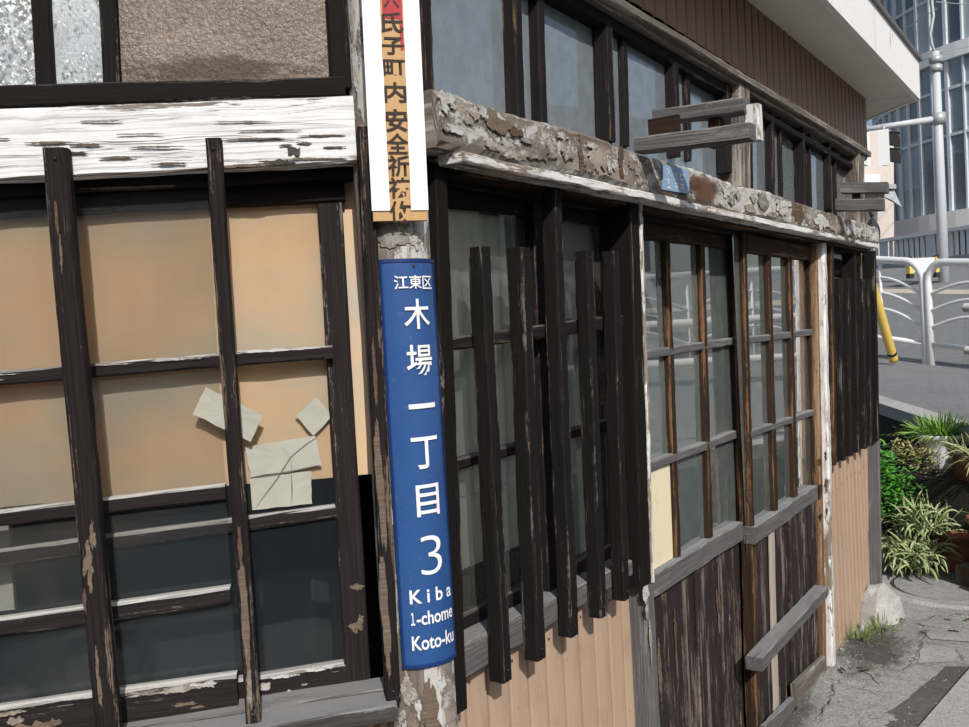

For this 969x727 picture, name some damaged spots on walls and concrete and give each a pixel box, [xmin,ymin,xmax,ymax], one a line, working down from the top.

peeling [29,141,104,154]
peeling [102,133,184,159]
peeling [215,121,346,168]
peeling [437,90,656,188]
peeling [82,520,97,615]
peeling [373,418,391,679]
peeling [348,614,364,634]
peeling [0,709,62,727]
peeling [128,680,217,709]
peeling [400,670,456,727]